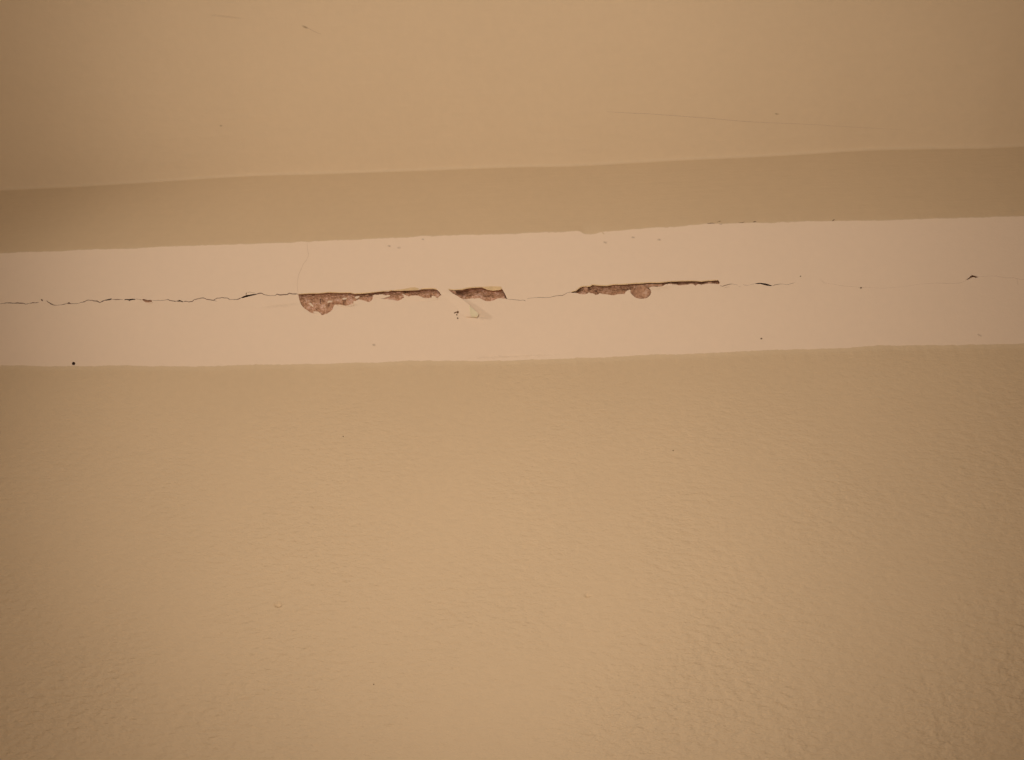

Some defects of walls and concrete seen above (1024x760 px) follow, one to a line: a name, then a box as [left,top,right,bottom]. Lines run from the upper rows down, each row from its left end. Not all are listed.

crack [1,248,309,305]
spalling [298,286,507,316]
spalling [571,280,720,299]